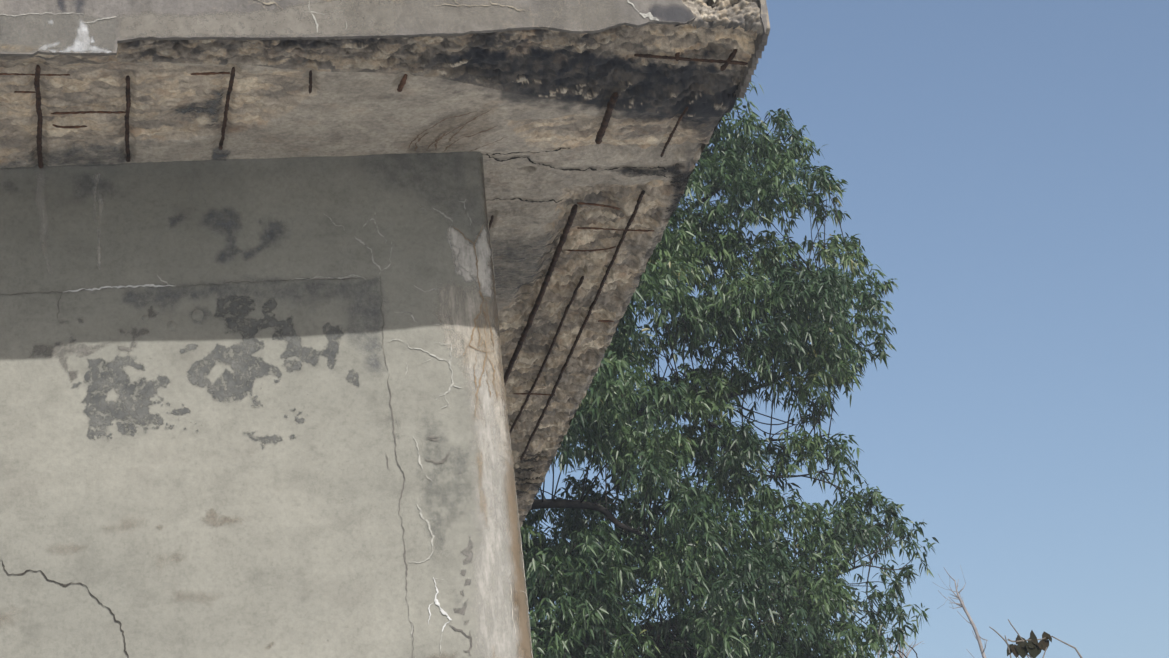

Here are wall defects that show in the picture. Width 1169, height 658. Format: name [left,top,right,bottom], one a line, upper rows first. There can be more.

leakage [43,0,112,53]
crack [1,148,682,658]
spalling [0,0,770,528]
flaking render [454,537,473,623]